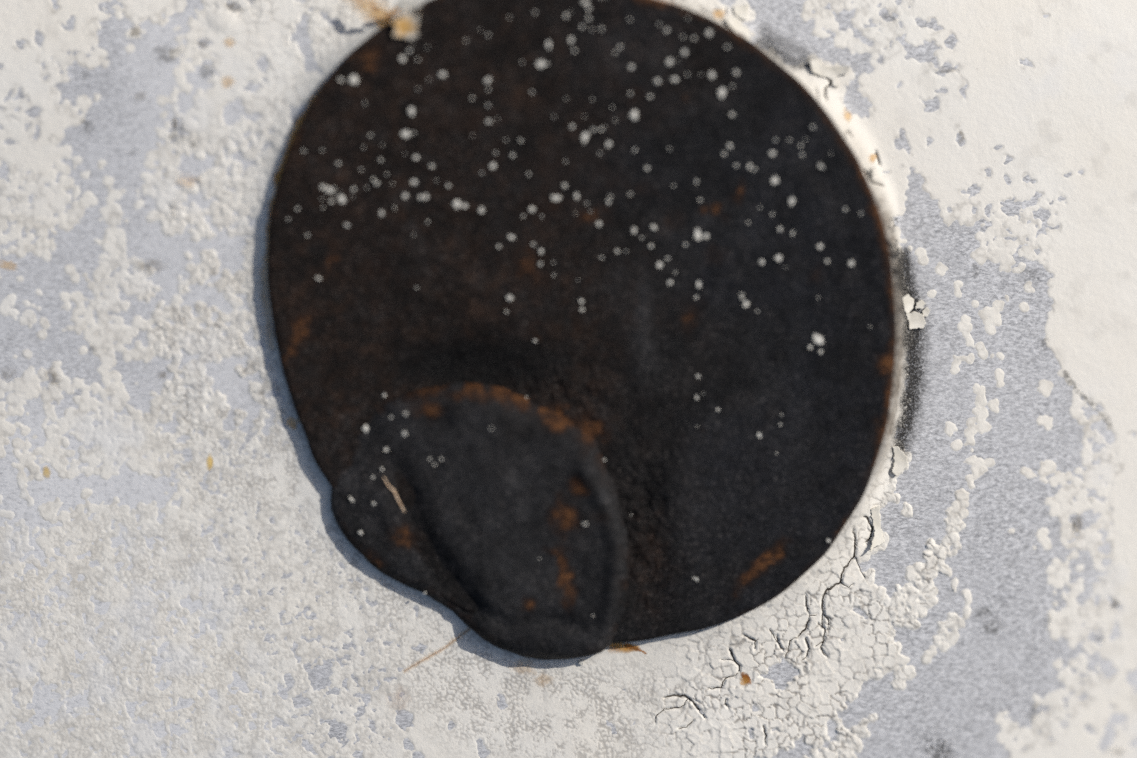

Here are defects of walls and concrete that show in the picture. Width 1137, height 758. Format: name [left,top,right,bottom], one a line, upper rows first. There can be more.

peeling [648,30,738,99]
peeling [715,0,968,119]
rust [266,88,320,261]
peeling [413,155,484,213]
peeling [570,110,637,155]
peeling [0,0,428,758]
peeling [754,128,1137,758]
rust [610,643,646,654]
crack [655,516,874,729]
peeling [476,738,490,758]